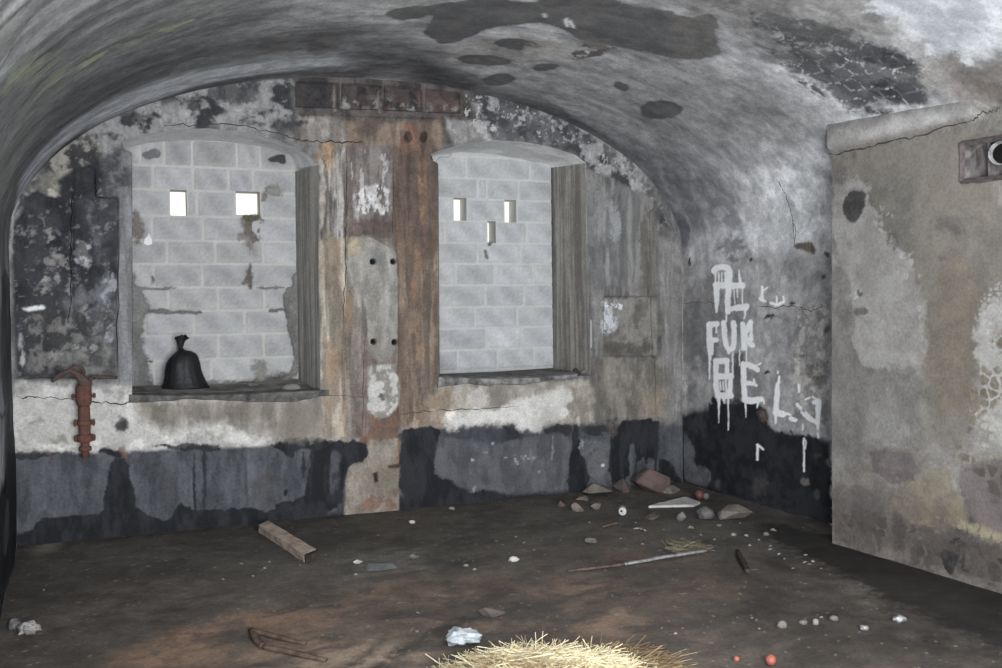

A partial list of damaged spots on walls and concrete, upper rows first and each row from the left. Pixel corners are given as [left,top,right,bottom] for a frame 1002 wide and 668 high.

leakage [517,38,581,63]
crack [830,107,1000,155]
crack [162,123,366,316]
crack [17,259,129,405]
leakage [129,398,343,510]
corrosion [319,80,466,514]
peeling [433,383,621,498]
leakage [832,128,1002,547]
peeling [945,280,1002,468]
leakage [745,521,1002,668]